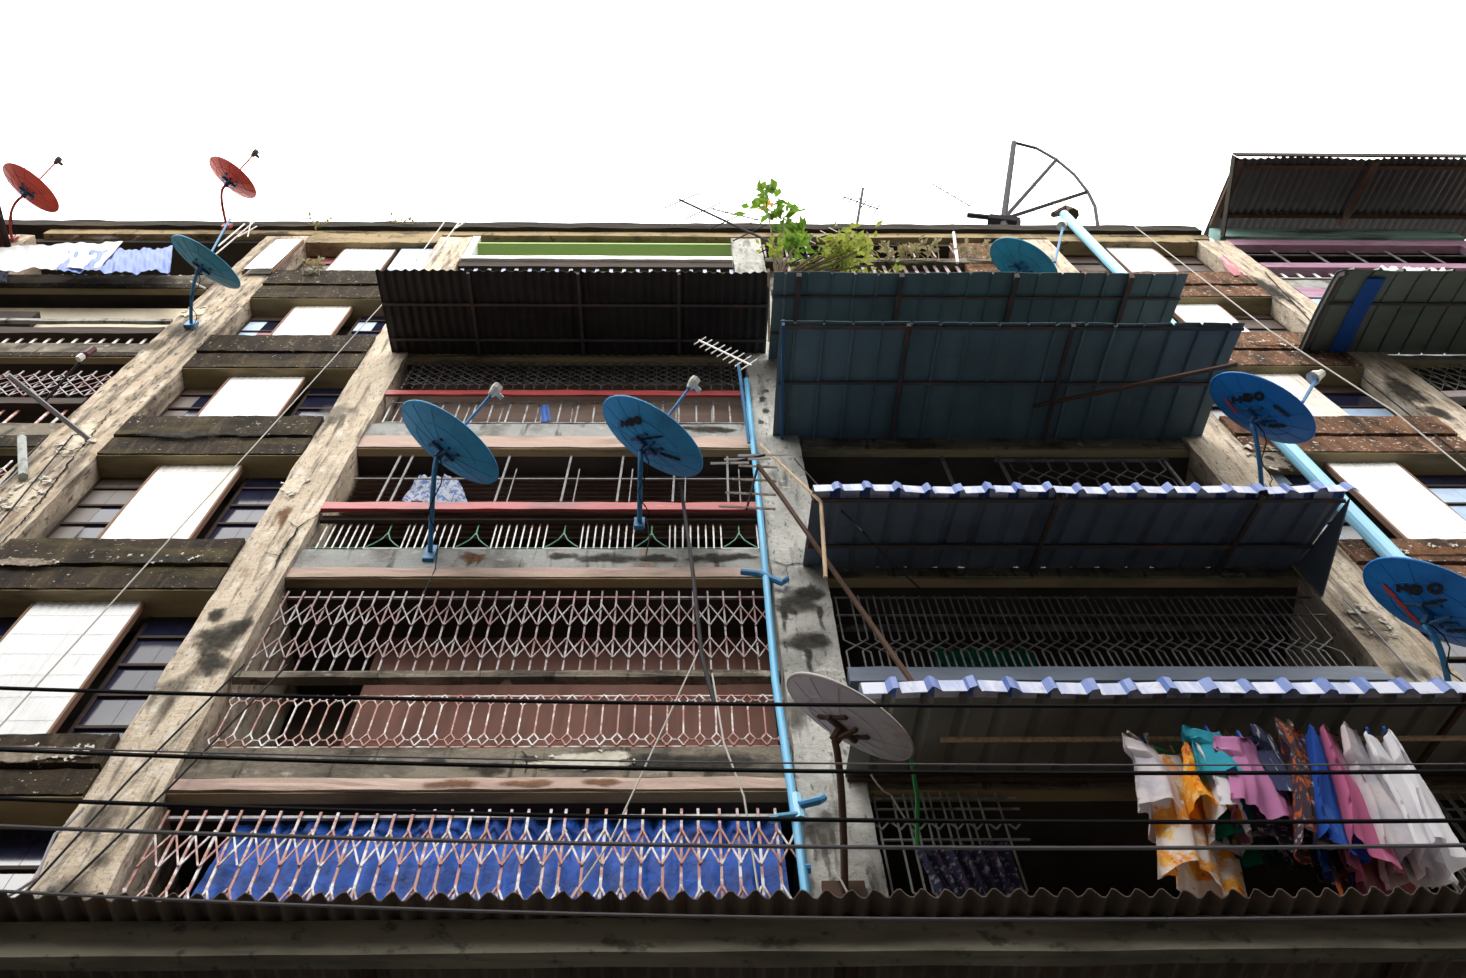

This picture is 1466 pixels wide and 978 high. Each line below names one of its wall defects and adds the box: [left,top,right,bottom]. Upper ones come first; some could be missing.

leakage [191,608,253,676]
leakage [775,585,829,670]